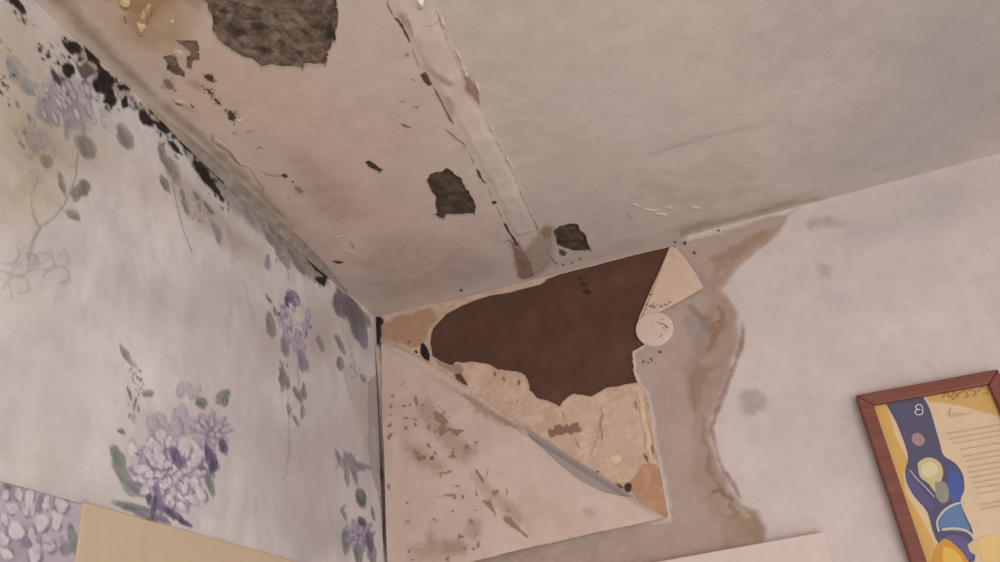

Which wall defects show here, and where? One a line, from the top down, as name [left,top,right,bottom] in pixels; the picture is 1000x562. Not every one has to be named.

peeling [119,0,170,37]
flaking render [196,0,339,72]
flaking render [161,38,200,111]
flaking render [202,74,254,134]
water stain [38,37,328,286]
flaking render [426,168,476,220]
flaking render [552,223,592,256]
flaking render [385,245,677,428]
water stain [465,217,785,562]